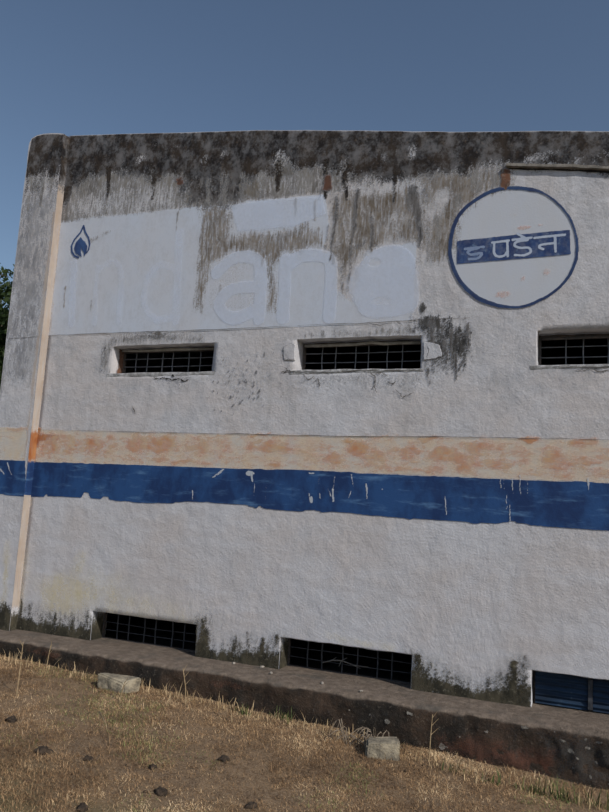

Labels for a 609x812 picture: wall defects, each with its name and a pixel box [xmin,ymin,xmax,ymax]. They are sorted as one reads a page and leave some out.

rust [322,174,332,203]
damp [0,130,609,397]
peeling [40,433,227,465]
peeling [239,433,609,516]
damp [0,581,104,640]
damp [195,617,289,669]
damp [411,650,531,707]